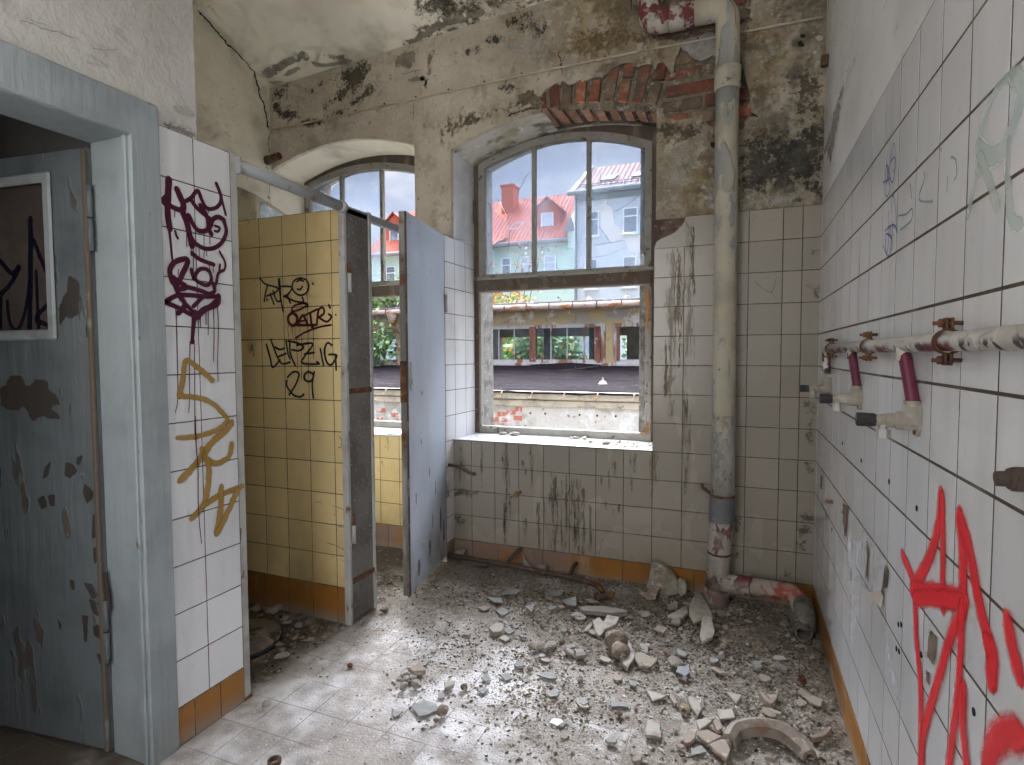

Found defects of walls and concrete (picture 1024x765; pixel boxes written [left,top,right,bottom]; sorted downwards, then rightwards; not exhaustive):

leakage [416,0,550,56]
crack [198,11,270,152]
peeling [260,51,352,84]
leakage [273,58,375,127]
leakage [441,81,545,141]
spalling [541,0,715,129]
spalling [739,60,756,130]
leakage [738,68,825,202]
peeling [0,375,60,421]
leakage [523,478,592,554]
peeling [70,514,111,642]
spalling [865,540,889,606]